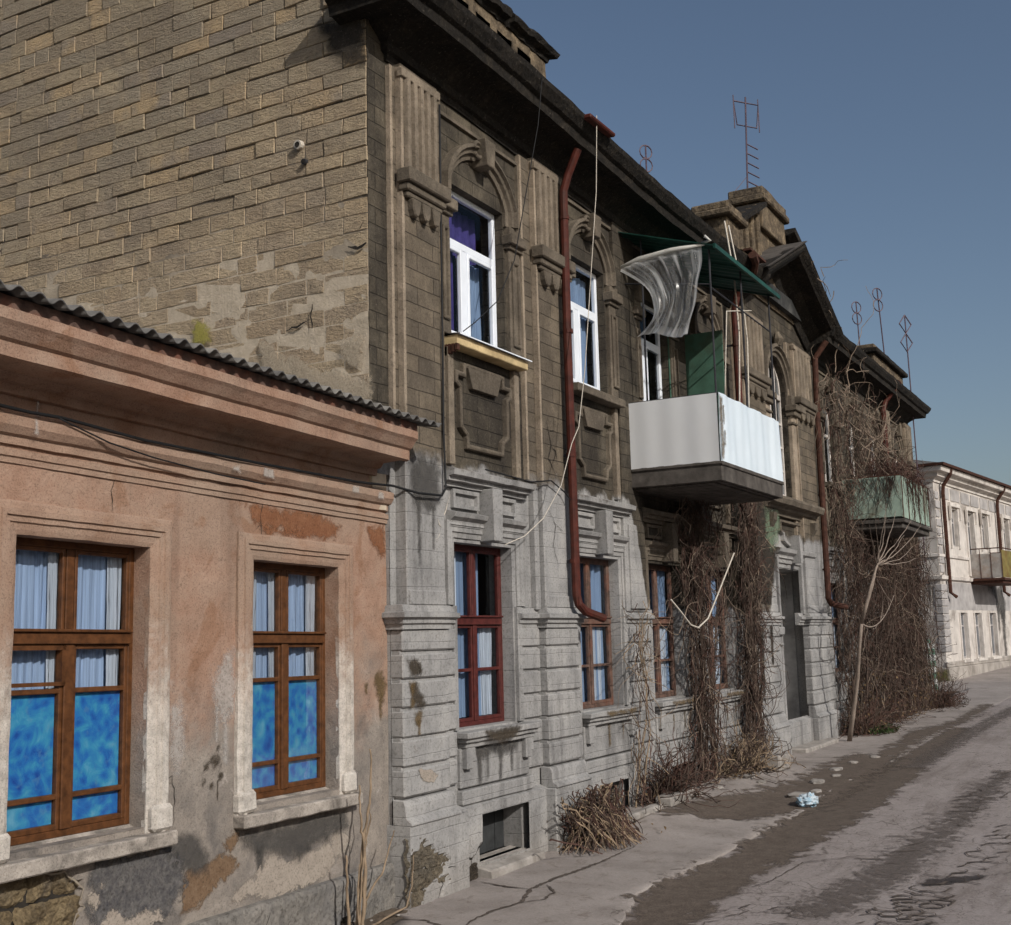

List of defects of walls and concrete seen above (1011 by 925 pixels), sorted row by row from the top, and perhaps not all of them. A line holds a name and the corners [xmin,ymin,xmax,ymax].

peeling [250,503,341,541]
flaking render [0,830,240,925]
water stain [168,835,209,873]
spalling [403,838,451,909]